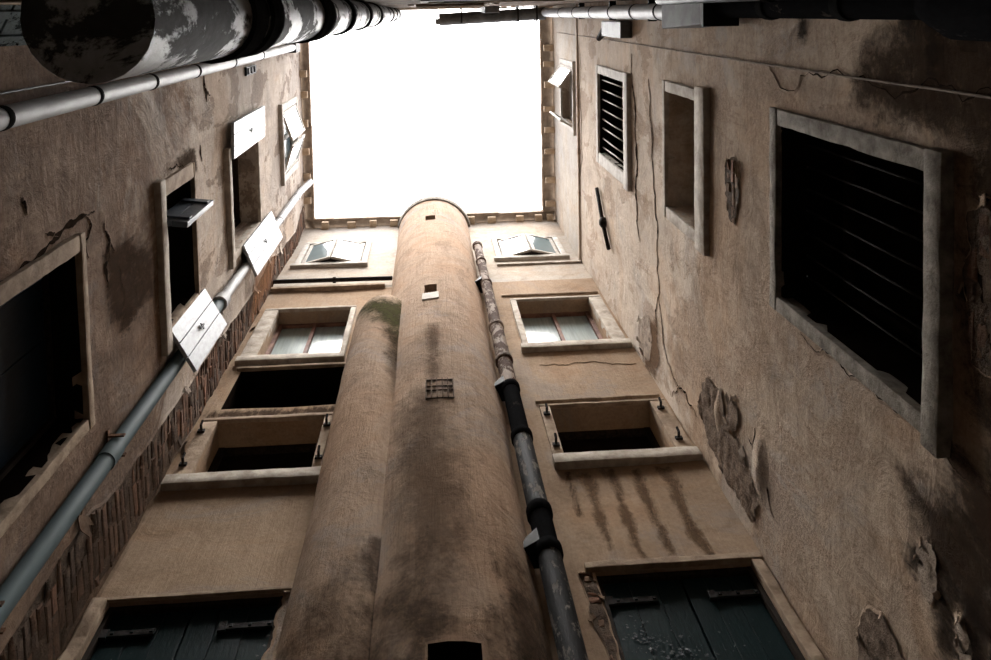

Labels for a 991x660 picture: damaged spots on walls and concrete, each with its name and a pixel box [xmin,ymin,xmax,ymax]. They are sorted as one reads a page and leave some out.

damp [850,20,991,205]
crack [20,196,28,216]
crack [0,208,115,286]
crack [631,54,698,419]
spalling [724,154,741,227]
flaking render [0,204,306,660]
spalling [696,374,759,522]
damp [603,469,647,559]
damp [656,467,715,555]
spalling [912,536,941,609]
damp [897,444,991,660]
spalling [856,605,908,660]